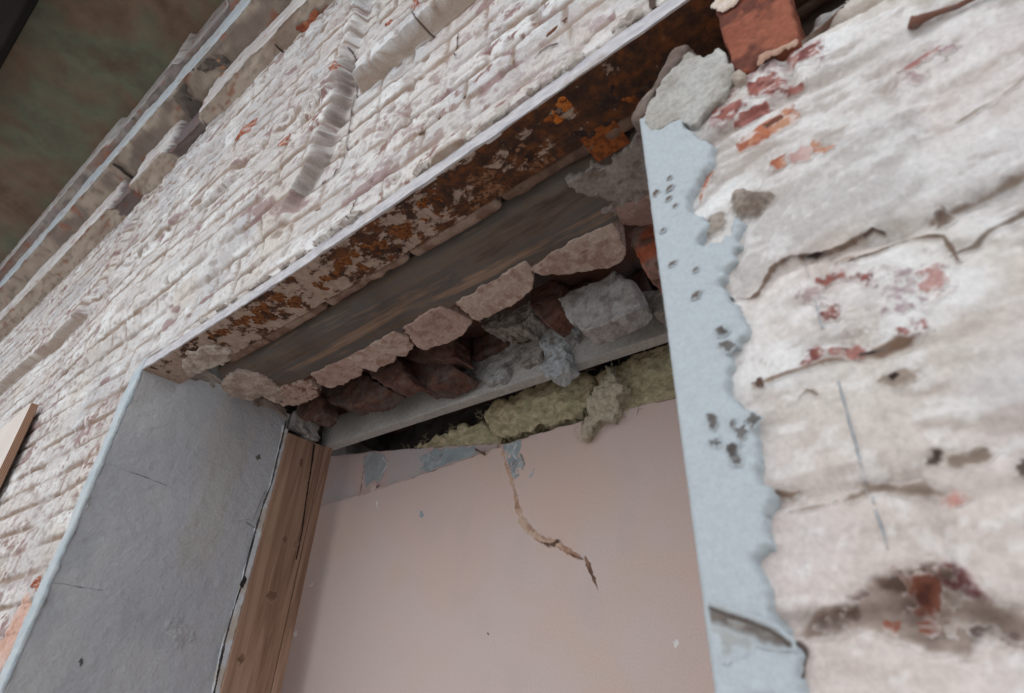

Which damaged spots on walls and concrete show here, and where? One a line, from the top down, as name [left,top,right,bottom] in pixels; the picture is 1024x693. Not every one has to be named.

rust [543,96,572,124]
rust [567,53,669,162]
peeling [700,35,832,155]
spalling [769,137,839,172]
rust [311,197,445,290]
rust [183,292,303,355]
spalling [714,324,738,354]
peeling [793,261,959,372]
spalling [705,411,764,467]
spalling [943,443,1007,472]
crack [501,444,599,591]
spalling [792,556,1024,661]